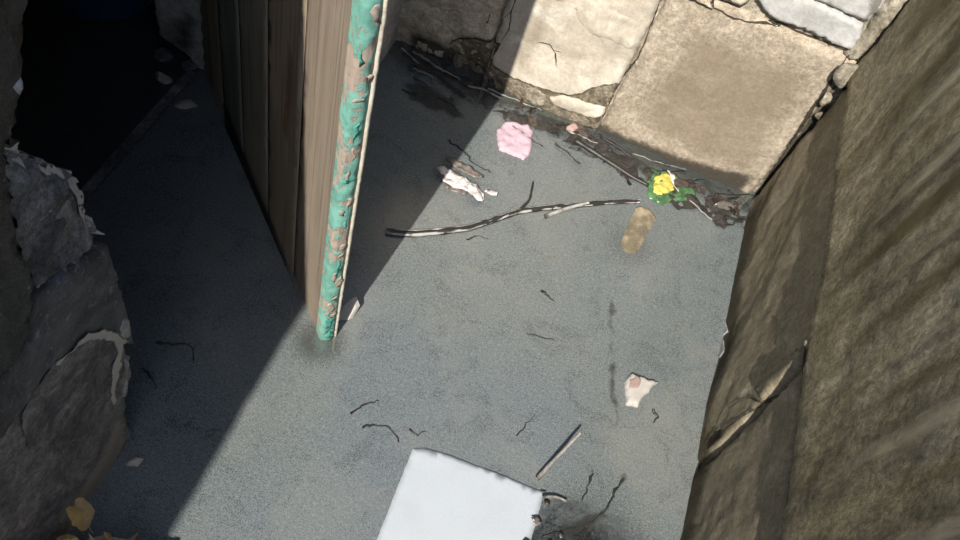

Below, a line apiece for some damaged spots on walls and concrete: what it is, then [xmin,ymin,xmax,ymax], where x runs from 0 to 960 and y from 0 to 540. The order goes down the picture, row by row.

peeling [370,4,381,24]
spalling [2,128,105,288]
peeling [323,244,347,341]
peeling [22,318,131,451]
crack [721,395,779,433]